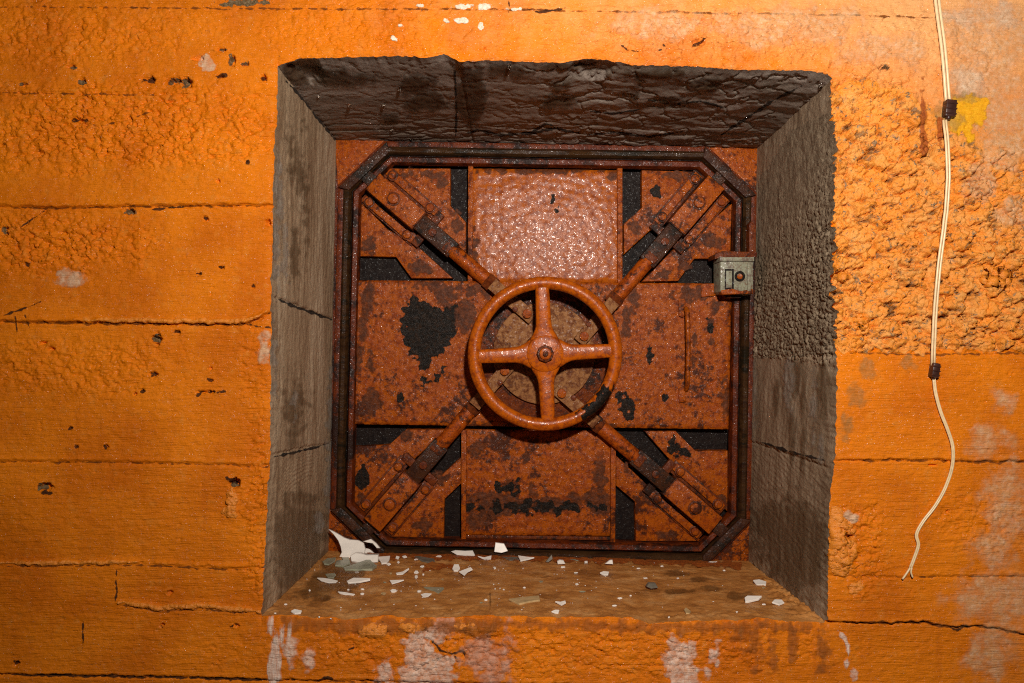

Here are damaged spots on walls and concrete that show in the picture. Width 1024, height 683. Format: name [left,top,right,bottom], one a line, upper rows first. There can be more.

peeling [443,3,491,30]
crack [4,299,332,330]
corrosion [398,260,491,387]
corrosion [669,283,753,369]
corrosion [570,384,635,428]
corrosion [667,434,691,458]
crack [761,442,824,461]
corrosion [466,456,610,530]
leakage [267,617,314,683]
leakage [355,617,512,683]
leakage [663,626,720,683]
crack [844,620,1024,635]